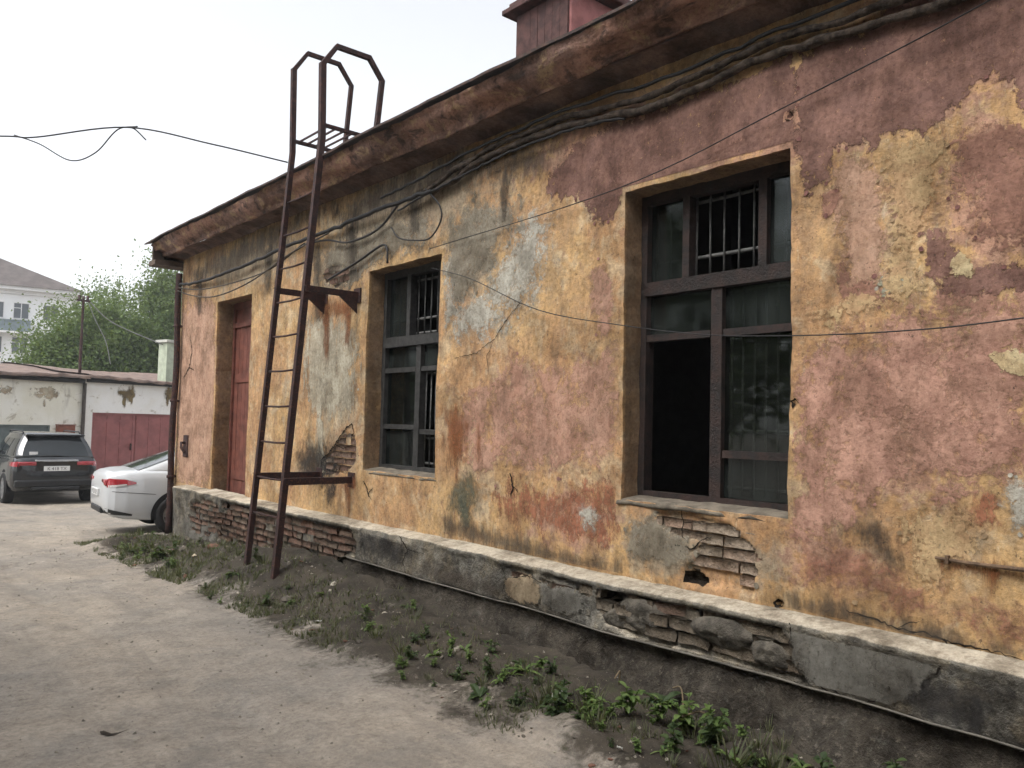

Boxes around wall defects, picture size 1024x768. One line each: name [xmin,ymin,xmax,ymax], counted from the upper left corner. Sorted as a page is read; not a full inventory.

crack [454,300,522,371]
flaking render [442,189,553,343]
peeling [546,0,1024,615]
flaking render [30,386,58,407]
peeling [175,295,363,560]
peeling [458,257,763,589]
water stain [443,472,619,570]
flaking render [511,571,804,676]
crack [847,610,1021,686]